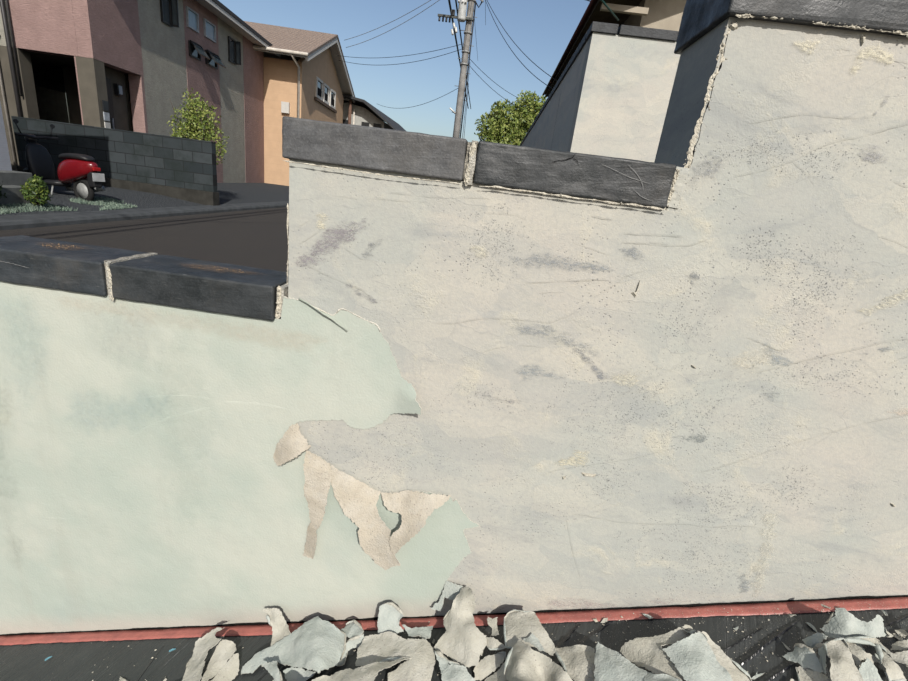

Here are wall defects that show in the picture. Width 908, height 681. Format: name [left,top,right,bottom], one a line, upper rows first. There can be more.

peeling [0,203,764,681]
flaking render [545,302,898,500]